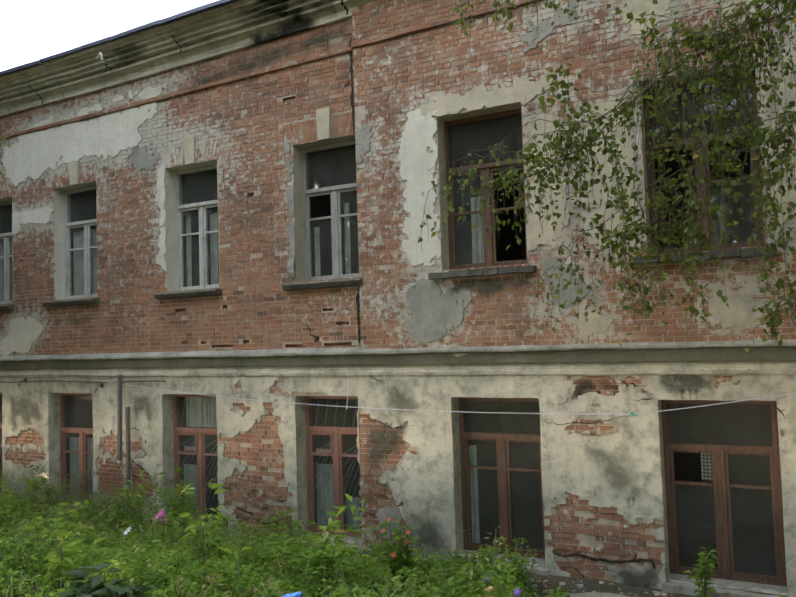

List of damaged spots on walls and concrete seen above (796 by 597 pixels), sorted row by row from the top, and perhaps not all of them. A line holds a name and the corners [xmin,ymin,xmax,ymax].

peeling [2,84,172,272]
peeling [356,125,374,169]
peeling [398,72,555,266]
peeling [524,114,612,345]
peeling [578,86,644,253]
peeling [403,276,472,348]
spalling [3,424,46,468]
spalling [96,431,160,501]
spalling [220,380,293,544]
spalling [356,410,418,551]
spalling [544,493,669,582]
spalling [566,375,648,396]